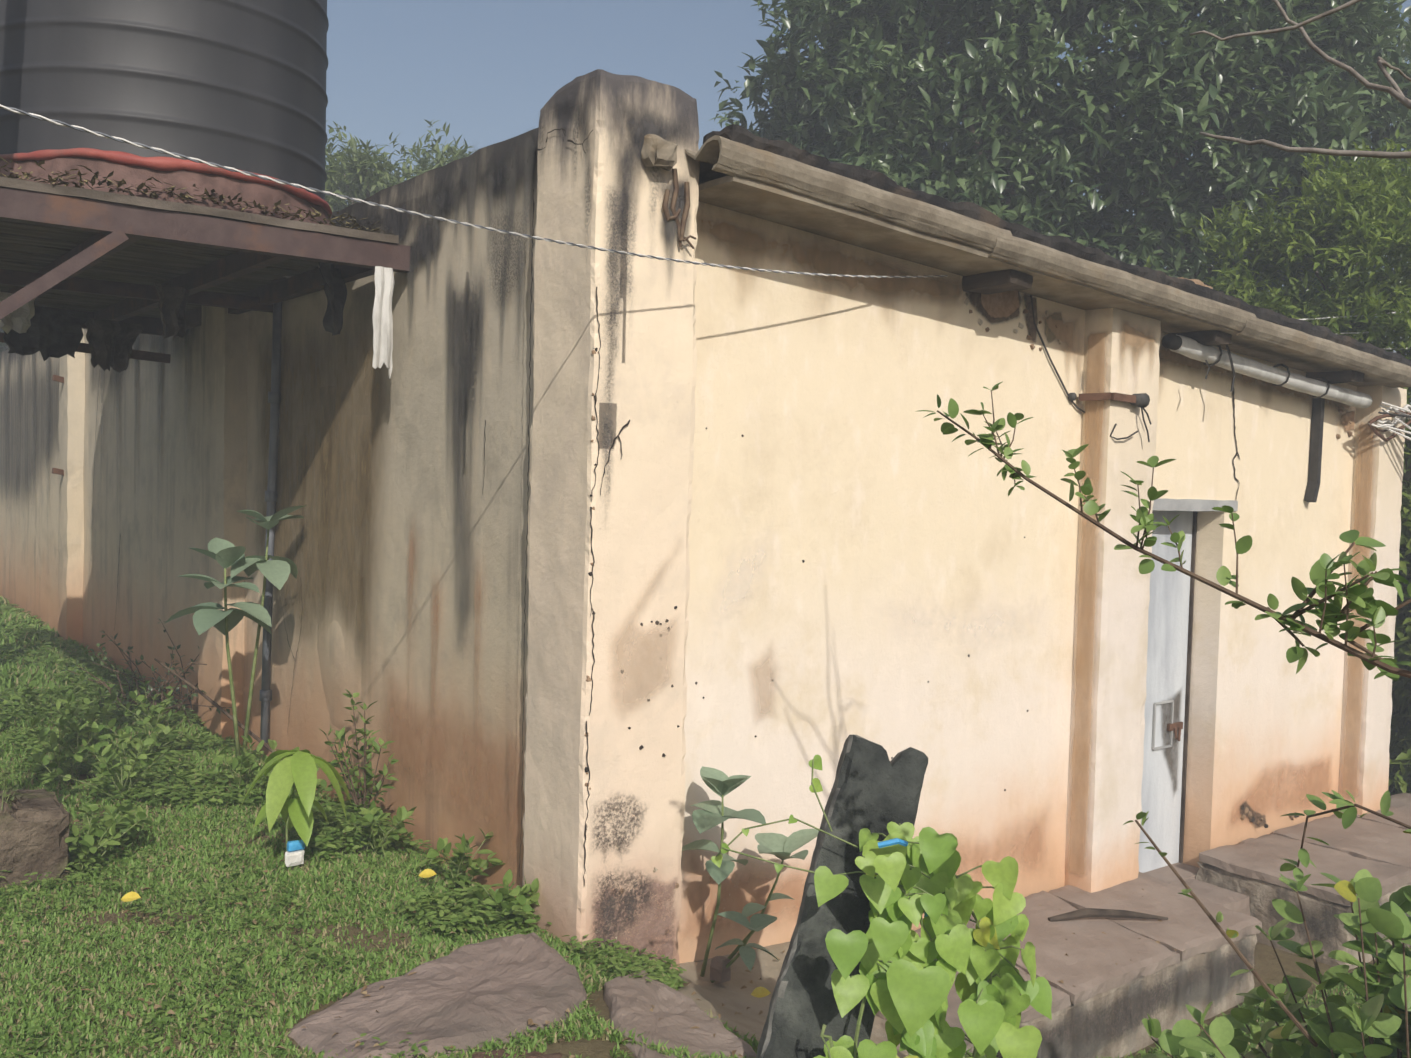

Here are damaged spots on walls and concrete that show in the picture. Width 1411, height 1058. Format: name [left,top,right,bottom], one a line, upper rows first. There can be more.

damp [345,127,544,618]
crack [600,419,630,495]
damp [595,800,643,848]
damp [597,873,651,938]